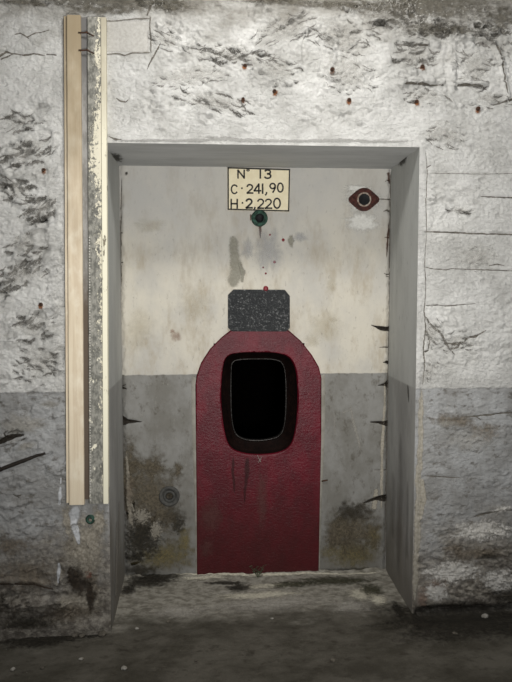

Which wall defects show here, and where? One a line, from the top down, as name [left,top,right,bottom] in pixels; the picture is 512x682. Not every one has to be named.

crack [0,30,57,60]
damp [229,237,245,286]
crack [423,159,512,381]
damp [123,444,184,575]